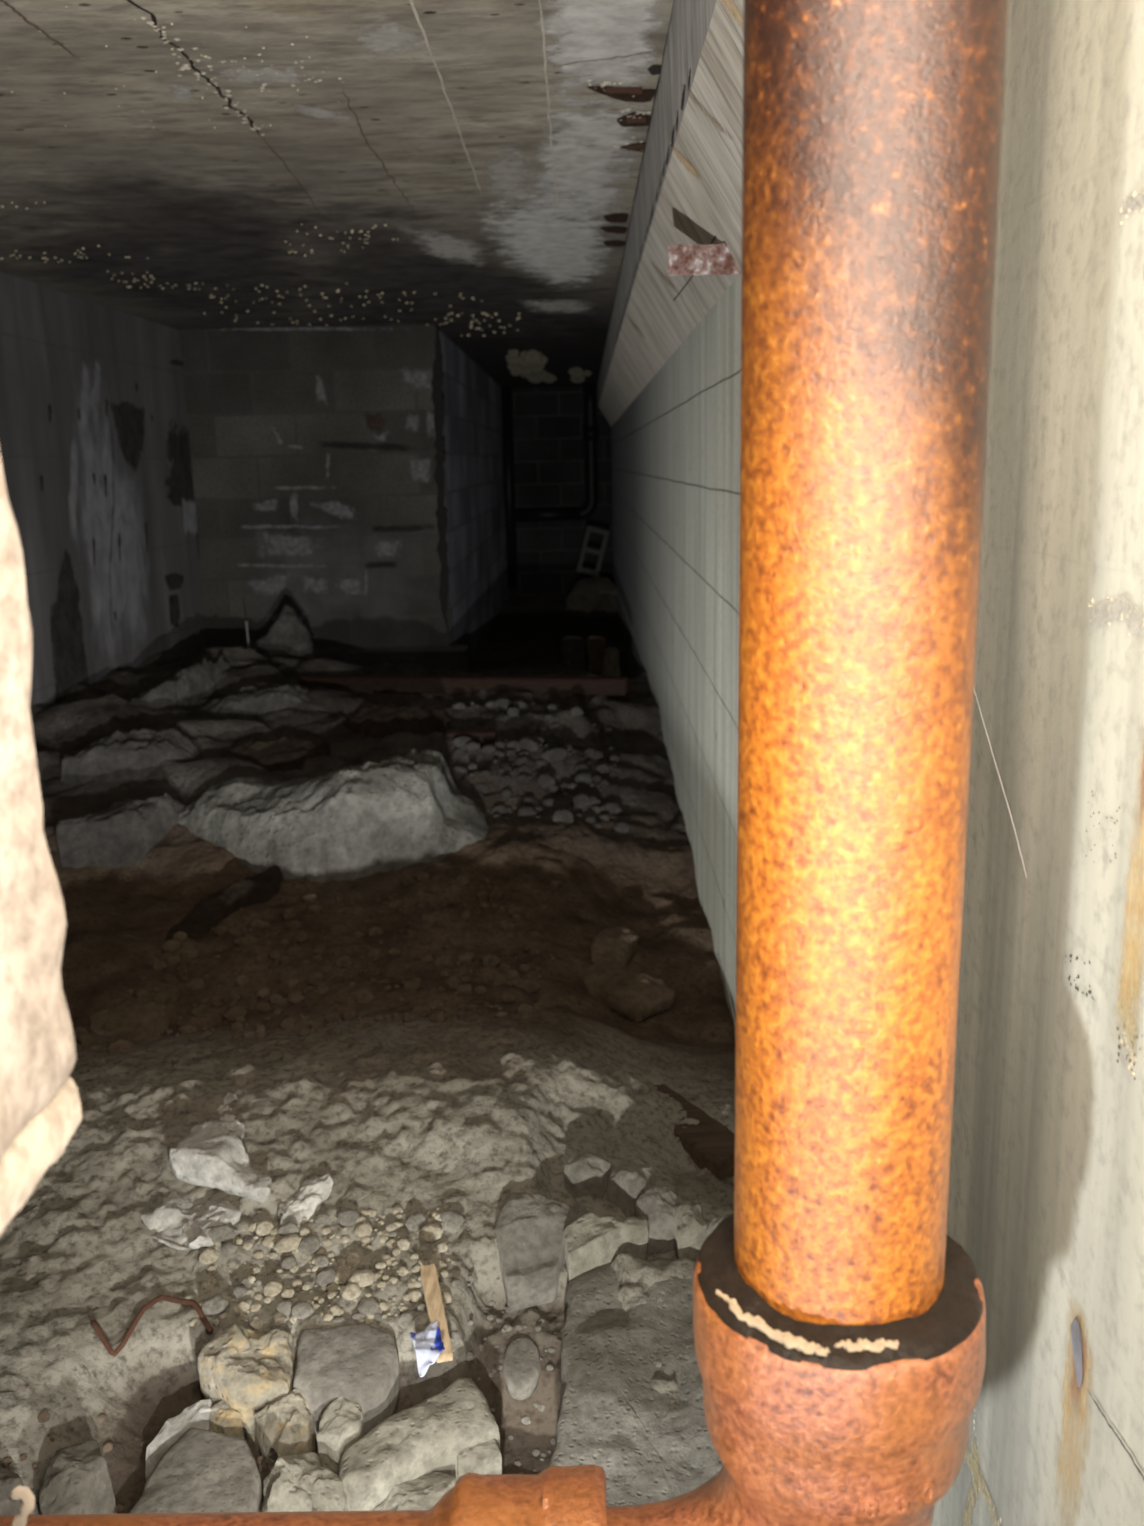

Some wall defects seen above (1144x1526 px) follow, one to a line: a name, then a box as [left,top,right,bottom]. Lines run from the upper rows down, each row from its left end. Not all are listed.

crack [0,0,79,59]
crack [127,0,322,215]
damp [23,0,662,338]
damp [51,362,153,704]
damp [165,573,184,627]
damp [165,423,200,560]
rust [1116,765,1144,1039]